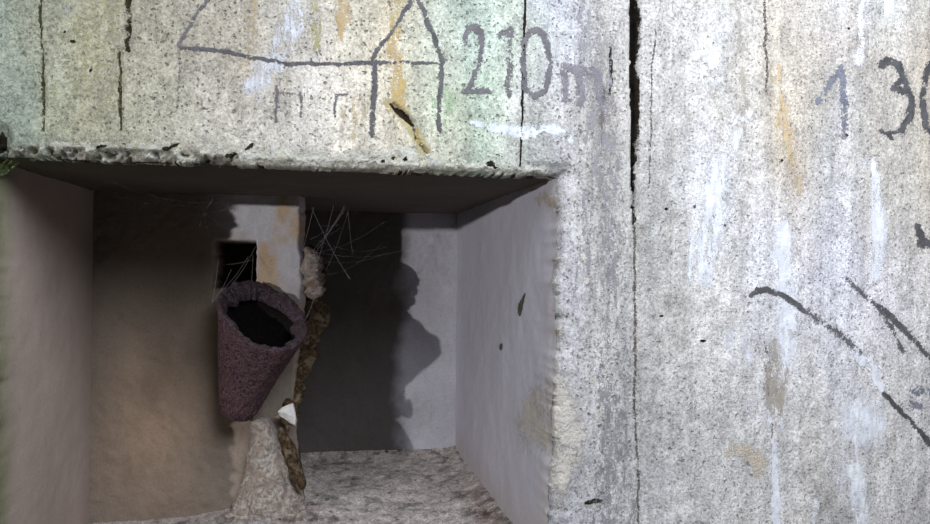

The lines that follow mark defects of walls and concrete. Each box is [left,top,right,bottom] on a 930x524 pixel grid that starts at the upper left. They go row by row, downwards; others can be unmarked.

crack [38,0,46,132]
crack [117,0,132,131]
rust [339,88,371,151]
rust [380,1,410,118]
crack [604,0,657,524]
leakage [685,0,754,311]
leakage [861,155,890,283]
leakage [851,0,901,67]
leakage [720,219,804,524]
leakage [825,349,891,524]